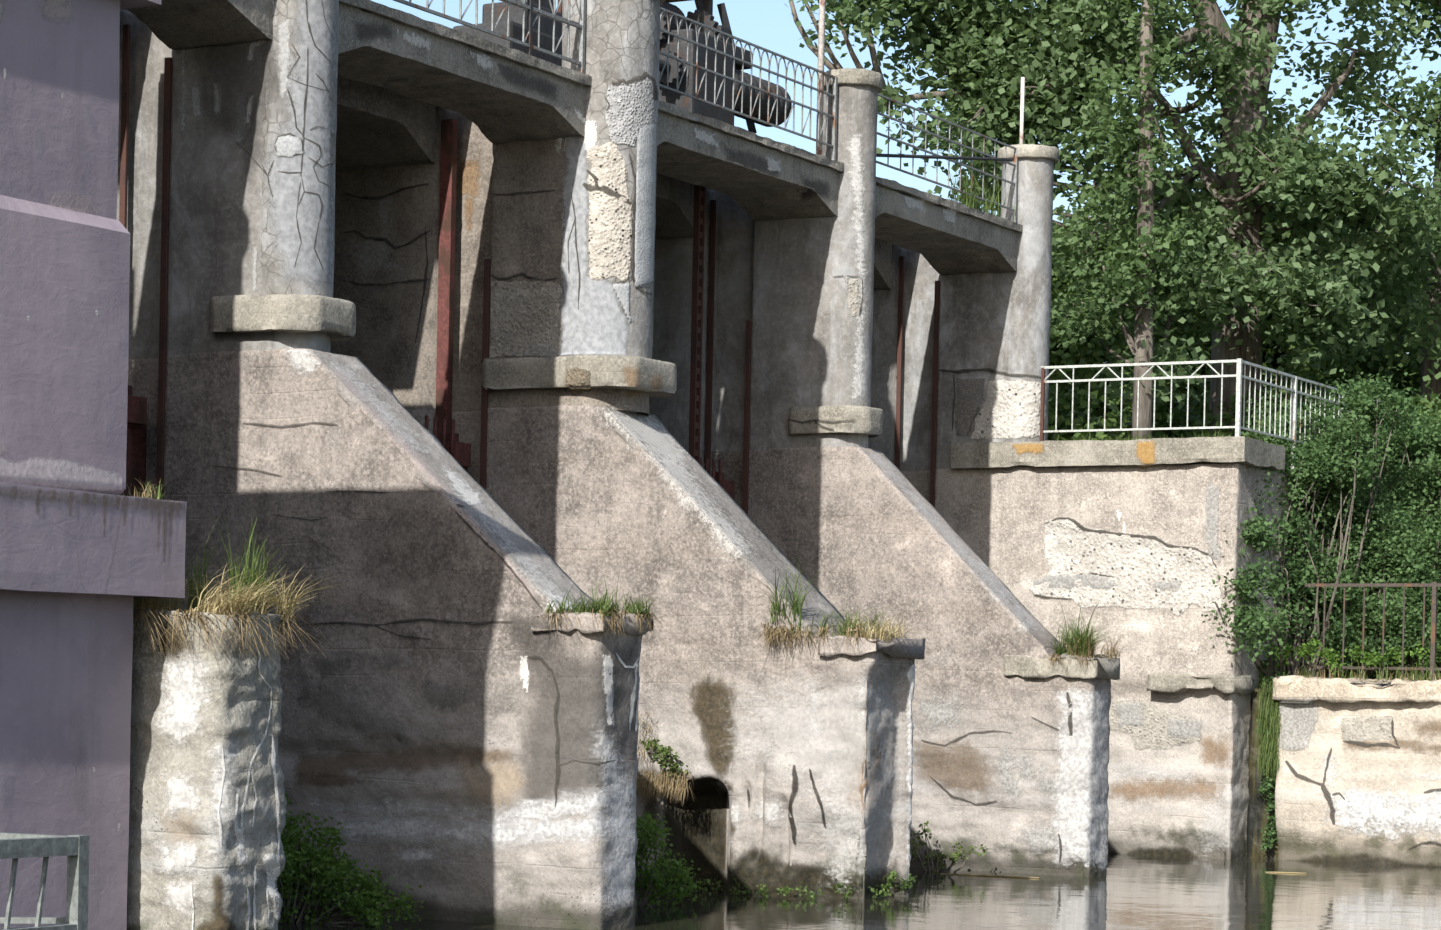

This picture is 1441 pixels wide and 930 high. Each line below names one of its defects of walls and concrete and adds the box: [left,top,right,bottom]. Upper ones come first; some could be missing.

crack [238,0,431,343]
spalling [587,77,658,322]
spalling [955,378,1046,439]
peeling [0,458,122,491]
spalling [1029,483,1224,616]
damp [157,621,210,744]
damp [157,651,281,930]
damp [340,653,915,904]
crack [788,765,826,844]
crack [1285,720,1400,824]
crack [1409,841,1441,850]